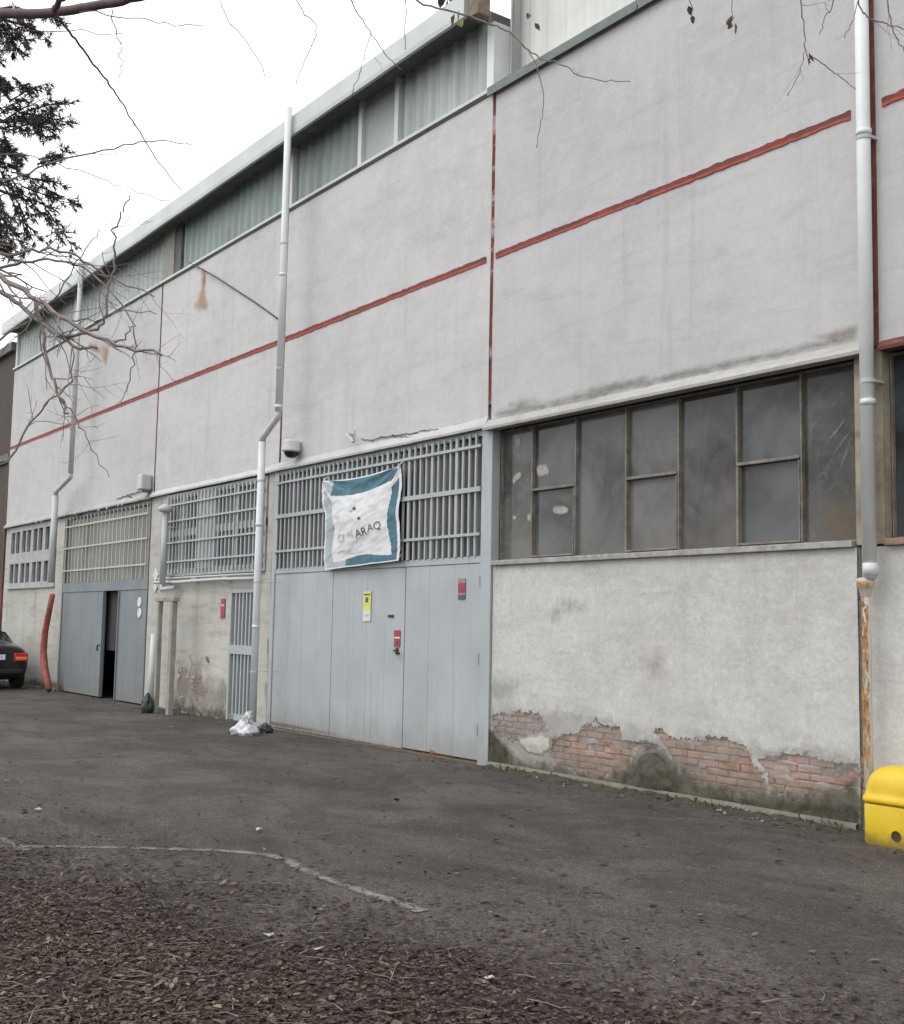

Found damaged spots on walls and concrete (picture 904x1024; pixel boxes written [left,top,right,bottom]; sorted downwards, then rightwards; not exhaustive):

corrosion [195,271,206,308]
corrosion [856,581,871,766]
water stain [488,728,861,827]
flaking render [491,710,865,815]